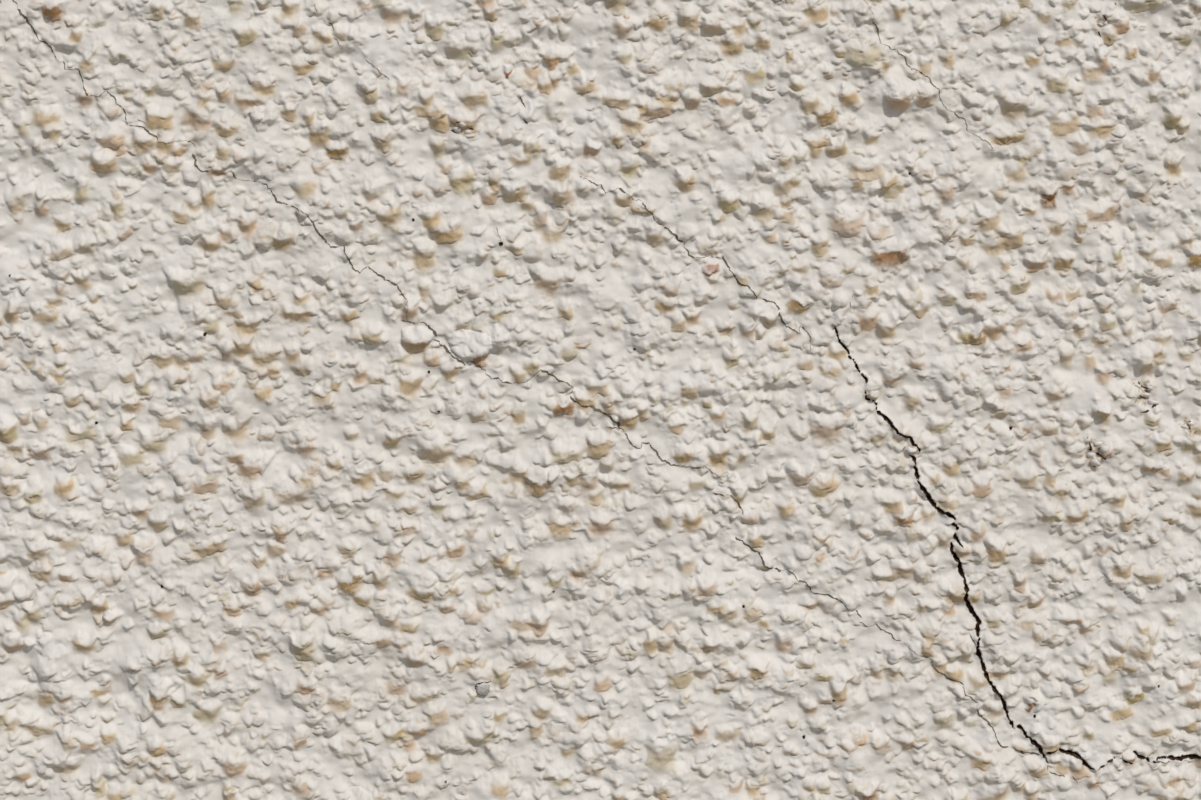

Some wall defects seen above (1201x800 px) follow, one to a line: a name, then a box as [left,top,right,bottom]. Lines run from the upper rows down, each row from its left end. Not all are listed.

crack [0,0,743,514]
crack [580,176,813,355]
crack [864,0,992,147]
crack [735,294,1201,783]